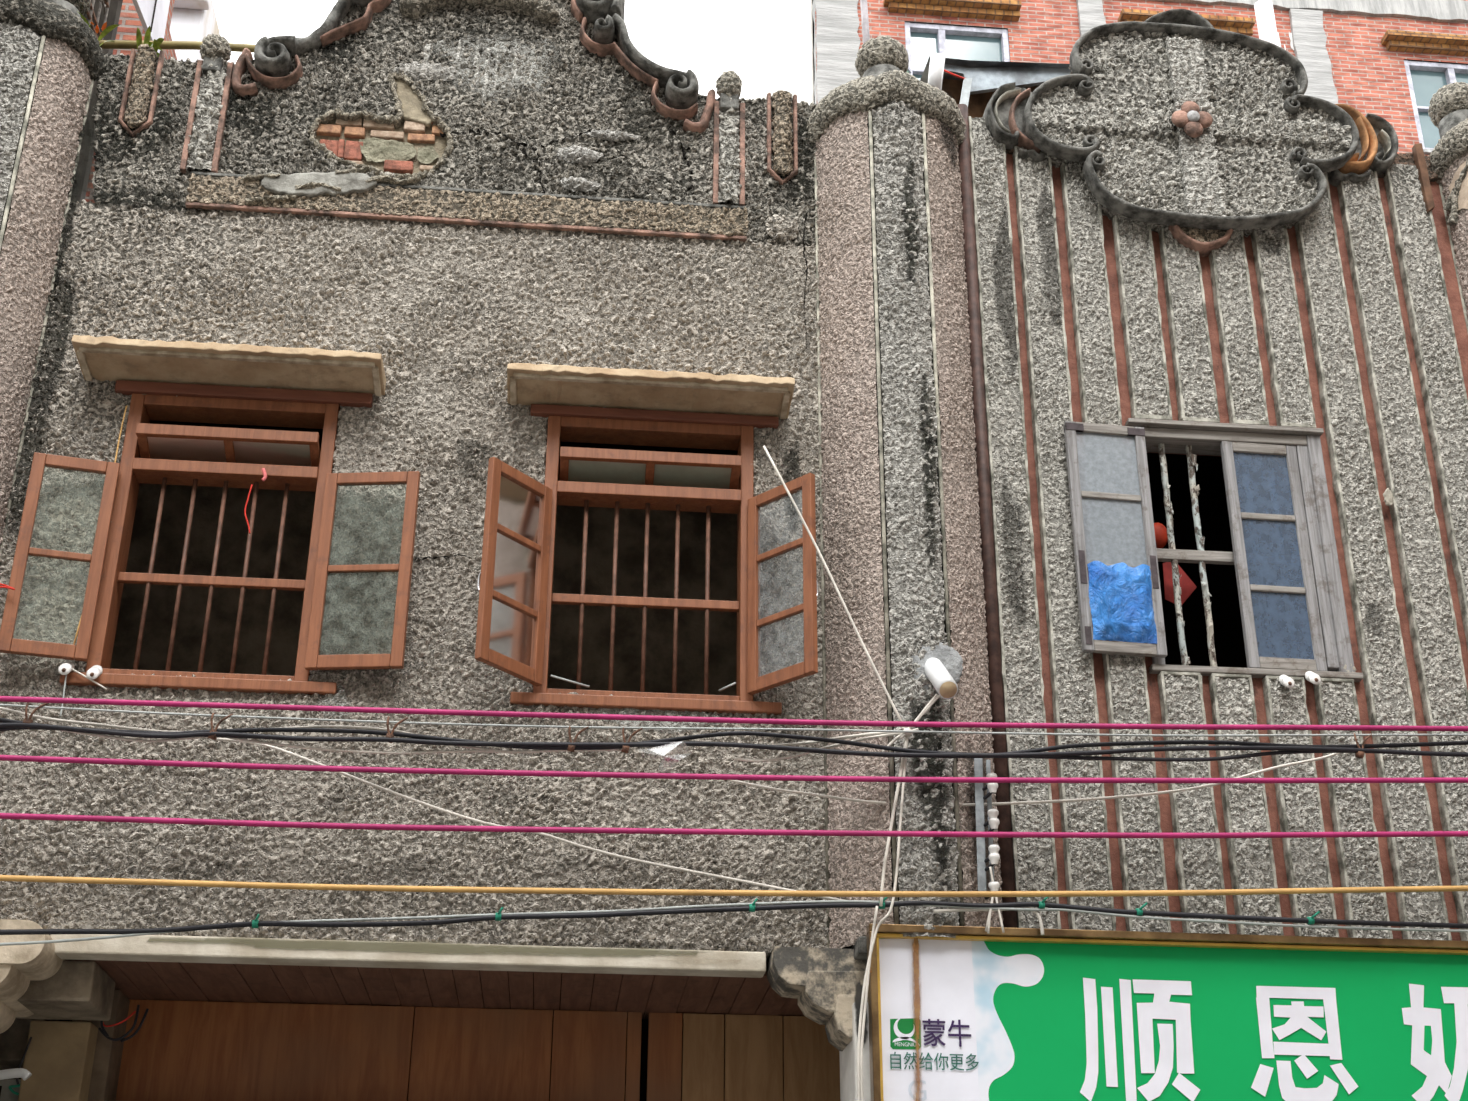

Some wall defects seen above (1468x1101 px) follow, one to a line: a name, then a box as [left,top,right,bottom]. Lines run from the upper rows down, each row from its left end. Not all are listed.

spalling [242,72,454,206]